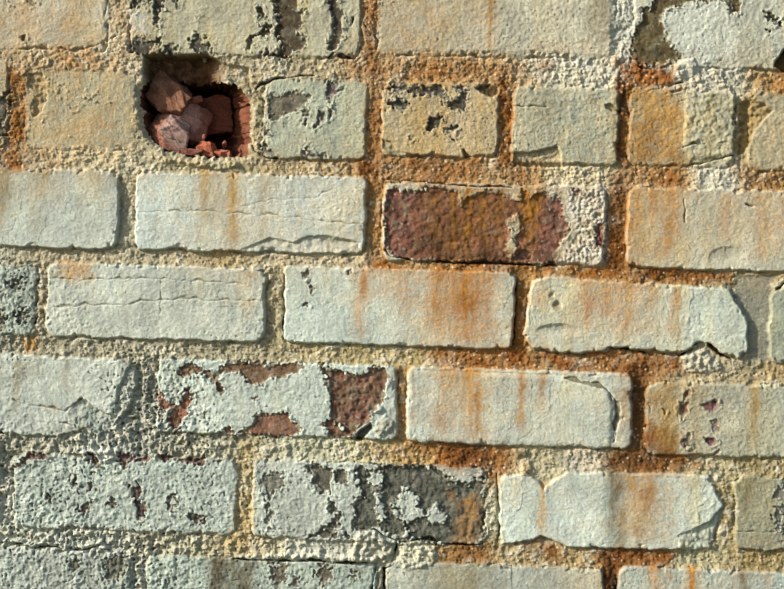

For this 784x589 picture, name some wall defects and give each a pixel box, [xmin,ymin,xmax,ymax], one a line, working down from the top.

peeling [246,0,308,61]
peeling [326,0,347,60]
peeling [629,0,742,62]
spalling [179,78,345,160]
rust [0,0,558,322]
rust [18,329,44,358]
rust [344,37,784,589]
peeling [156,360,305,434]
peeling [222,410,303,441]
peeling [318,362,390,438]
crack [233,486,500,589]
peeling [305,461,488,546]